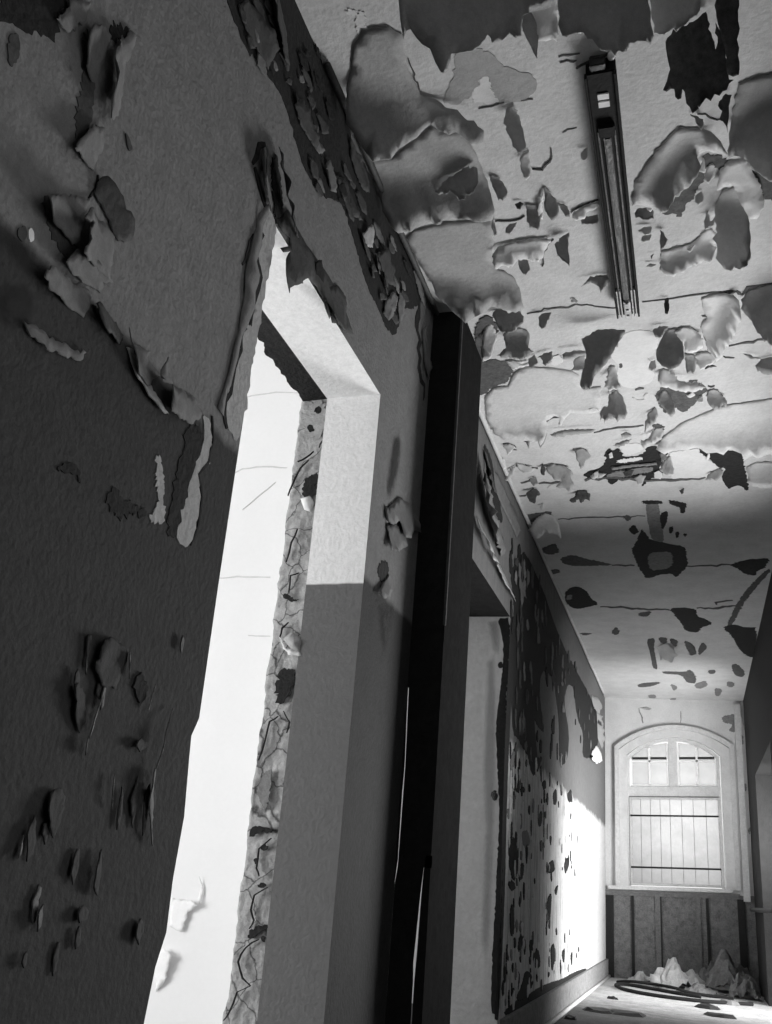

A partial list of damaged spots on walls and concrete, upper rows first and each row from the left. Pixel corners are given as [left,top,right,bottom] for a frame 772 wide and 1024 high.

spalling [0,0,353,547]
crack [235,466,287,510]
peeling [223,0,772,1021]
crack [219,573,270,581]
peeling [73,635,156,756]
peeling [111,708,174,846]
peeling [18,788,66,862]
peeling [70,848,80,885]
peeling [30,884,44,932]